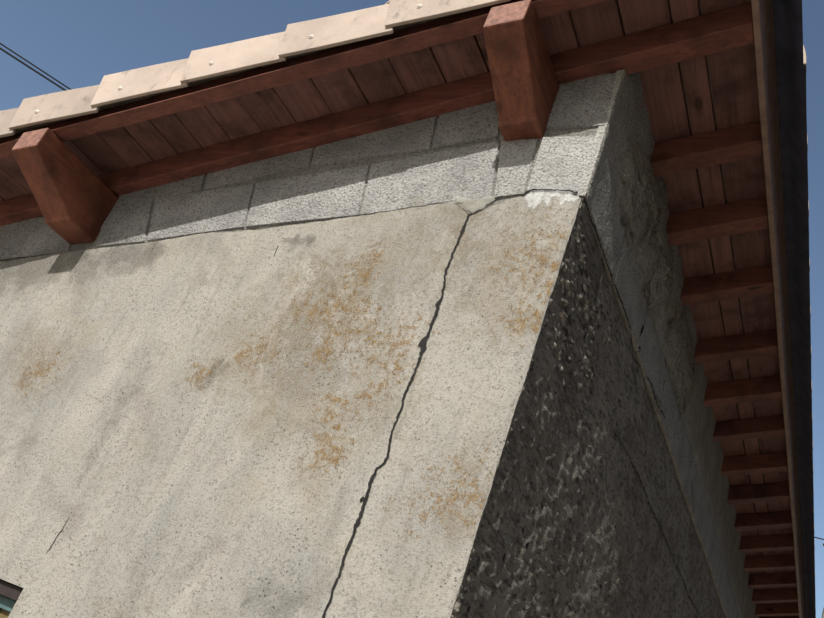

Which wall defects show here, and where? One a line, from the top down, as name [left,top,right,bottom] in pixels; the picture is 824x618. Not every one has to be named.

corrosion [295,242,430,477]
crack [219,188,665,618]
corrosion [414,455,486,535]
corrosion [487,204,569,336]